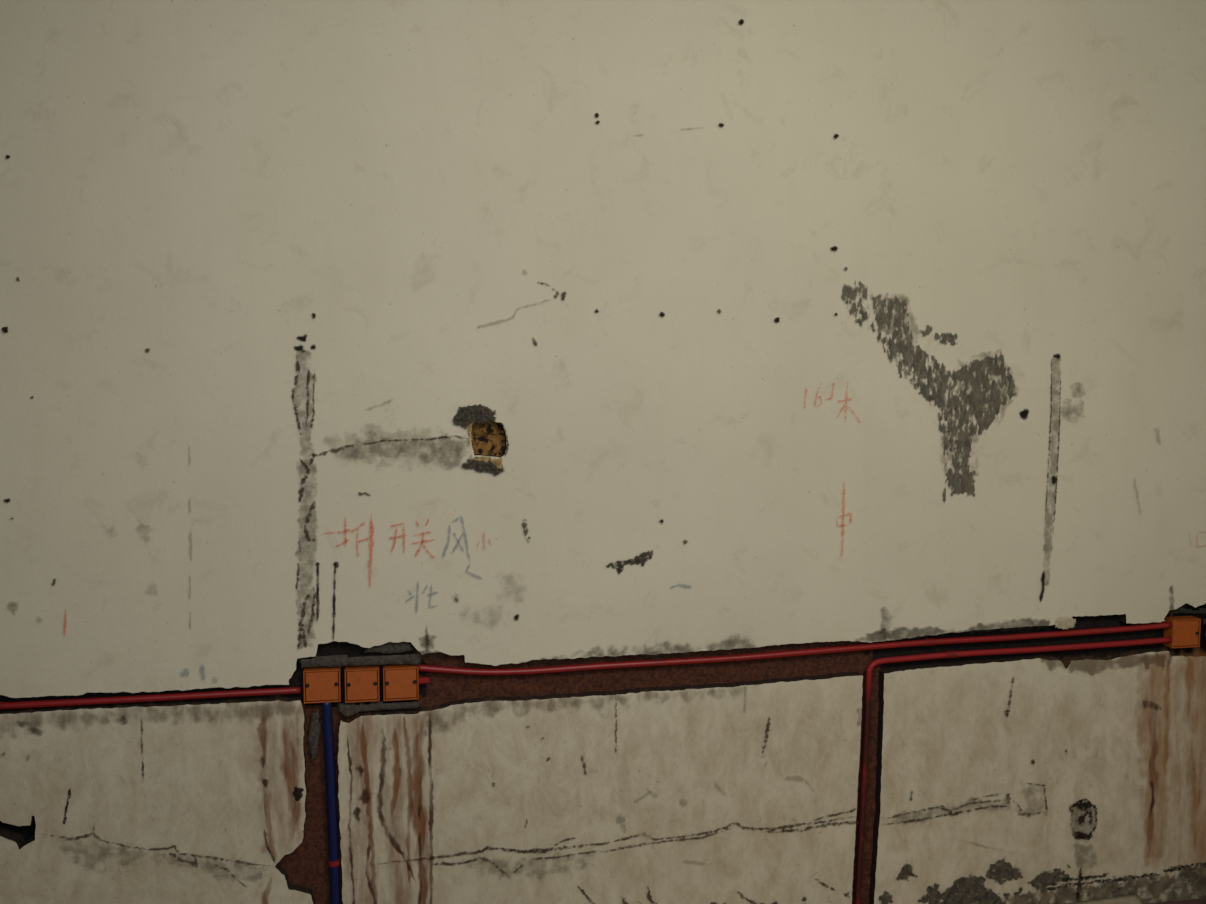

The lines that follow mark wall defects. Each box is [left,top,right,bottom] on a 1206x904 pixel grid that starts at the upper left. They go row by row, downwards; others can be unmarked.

spalling [453,404,509,476]
peeling [606,550,653,574]
corrosion [285,765,304,816]
corrosion [347,720,434,904]
crack [378,783,1048,877]